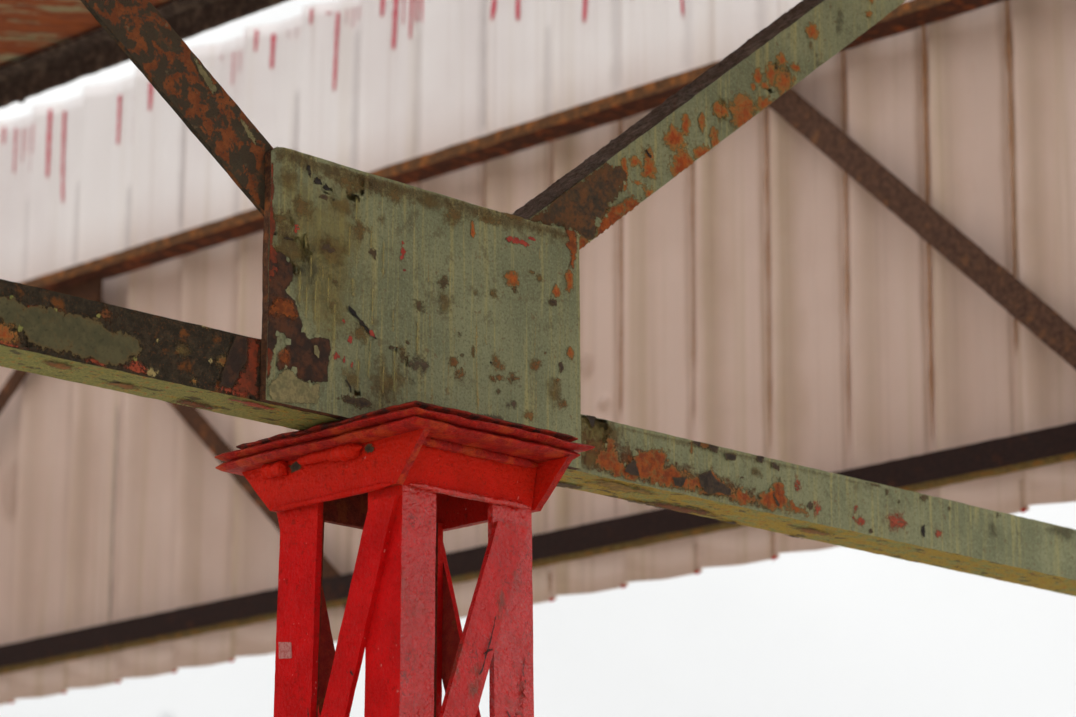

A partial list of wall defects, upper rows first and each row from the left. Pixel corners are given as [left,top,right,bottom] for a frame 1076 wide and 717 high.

rust [1006,0,1015,277]
rust [216,52,800,434]
rust [0,320,26,349]
peeling [0,295,143,366]
peeling [268,369,322,404]
rust [557,429,836,540]